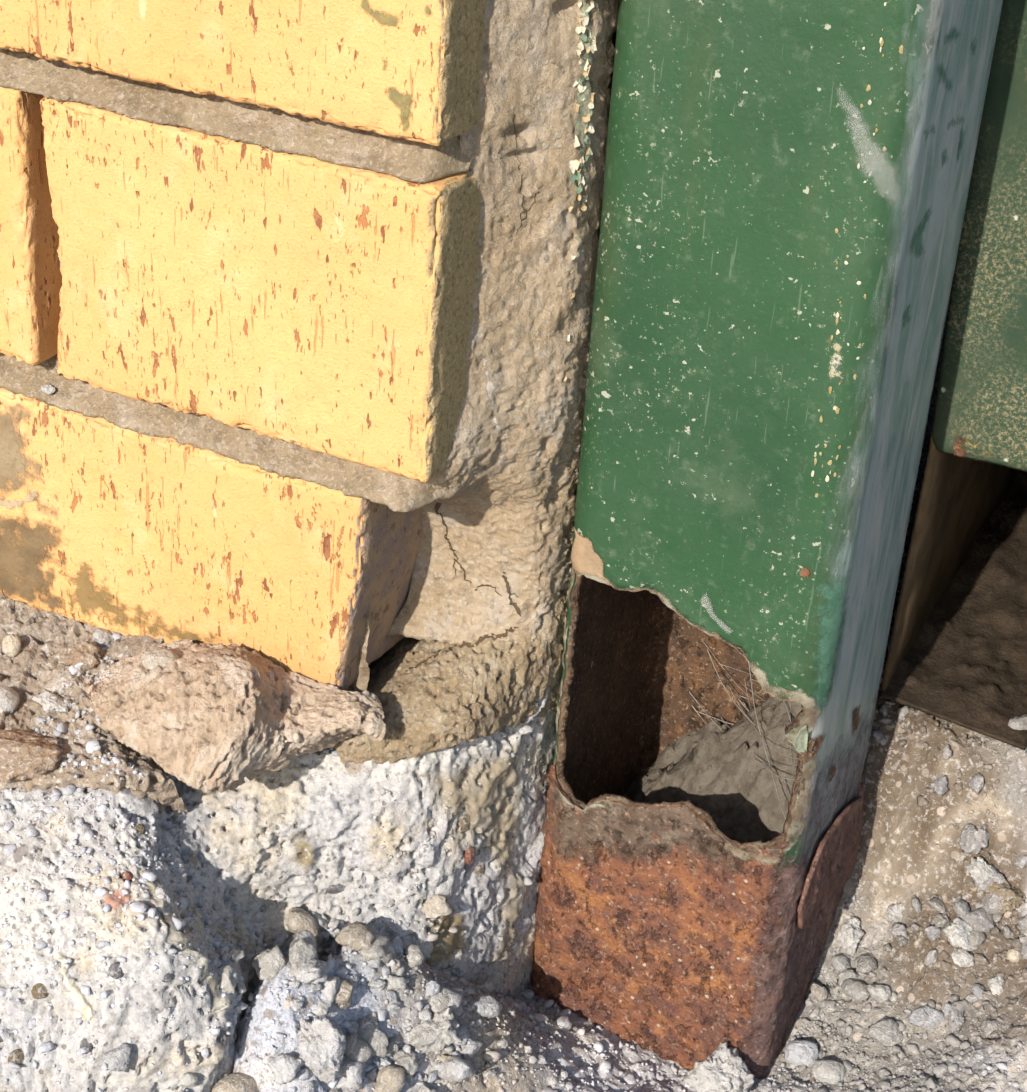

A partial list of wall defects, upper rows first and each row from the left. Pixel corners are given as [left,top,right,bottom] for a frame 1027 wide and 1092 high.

peeling [568,0,597,219]
leakage [0,405,213,644]
crack [405,502,521,672]
rust [531,569,868,1079]